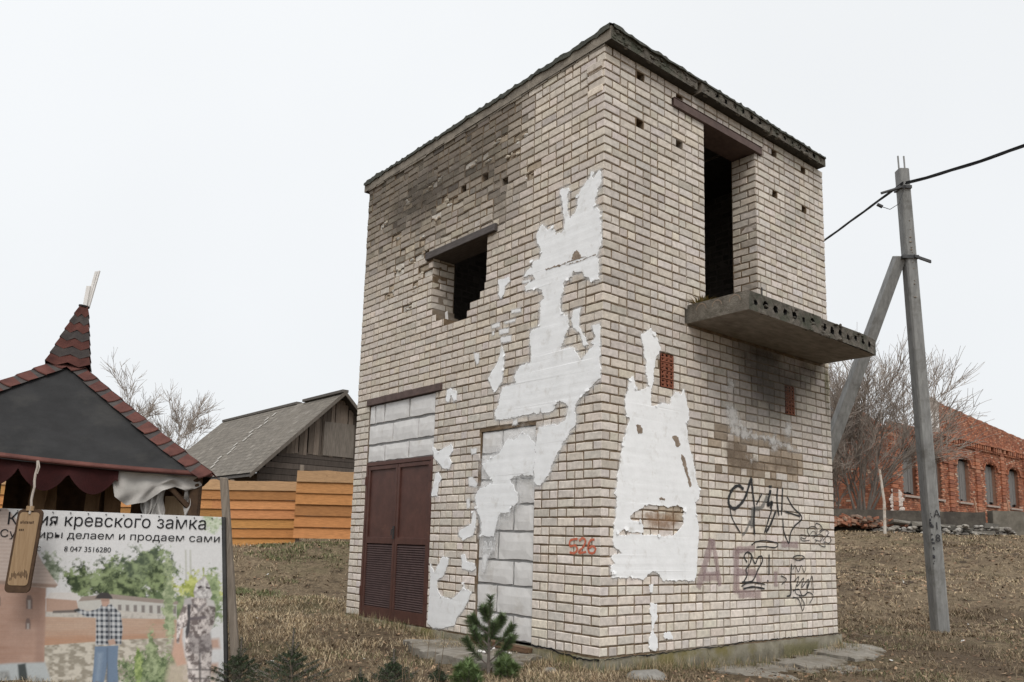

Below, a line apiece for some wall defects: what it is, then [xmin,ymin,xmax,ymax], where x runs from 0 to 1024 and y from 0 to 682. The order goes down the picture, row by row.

peeling [458,170,602,541]
peeling [446,388,457,402]
peeling [431,444,453,496]
peeling [610,328,701,582]
peeling [427,554,476,629]